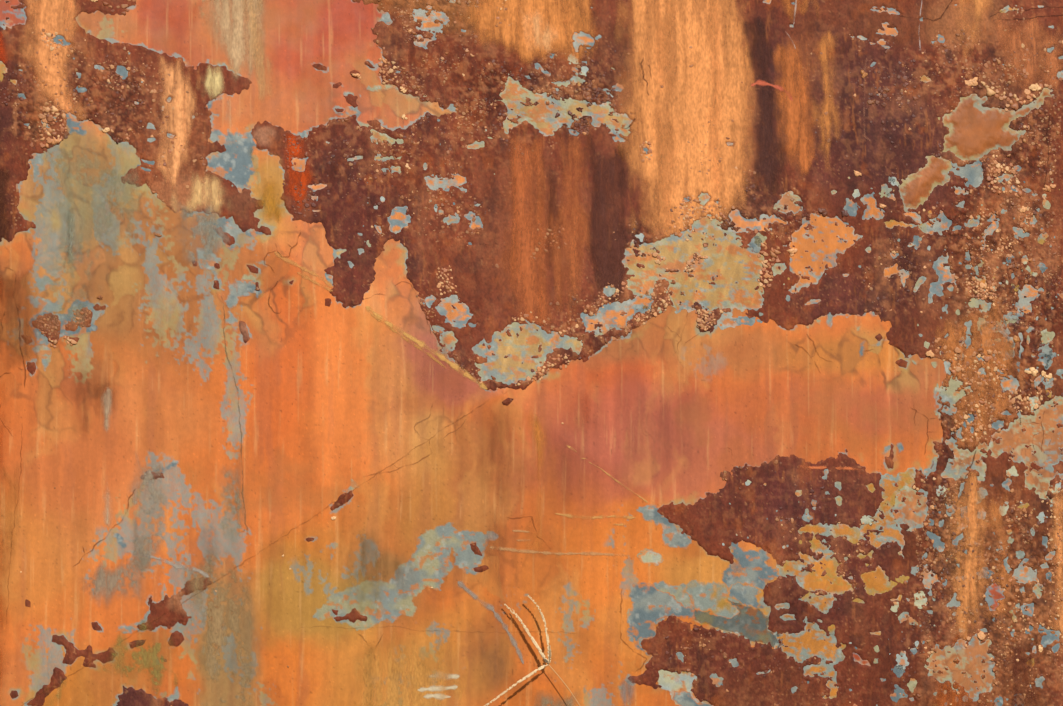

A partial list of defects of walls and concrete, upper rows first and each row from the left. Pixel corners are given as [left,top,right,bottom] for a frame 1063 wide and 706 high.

rust [0,0,271,246]
rust [21,304,106,344]
peeling [195,216,264,332]
peeling [424,174,467,193]
peeling [423,295,478,354]
rust [251,0,1063,706]
peeling [472,88,1054,385]
peeling [626,249,1063,706]
rust [129,577,212,649]
peeling [312,522,499,631]
rust [10,635,118,706]
rust [116,685,189,706]